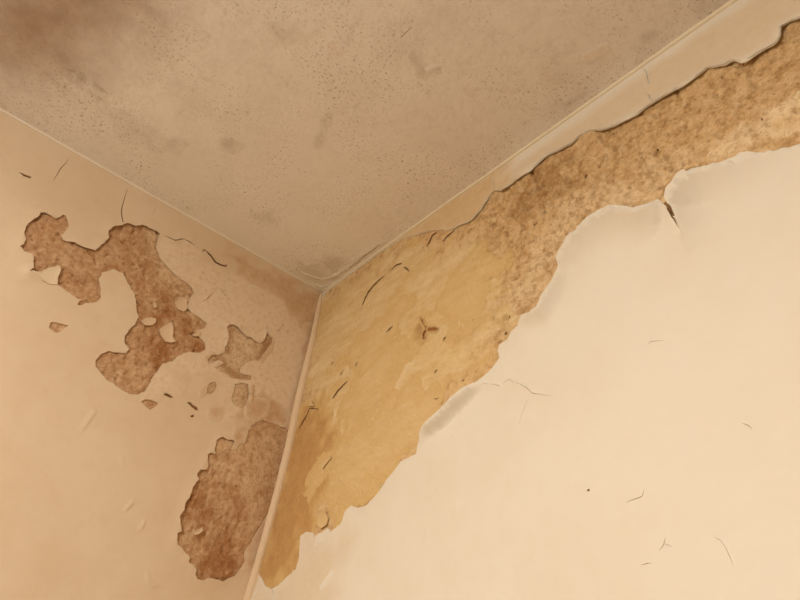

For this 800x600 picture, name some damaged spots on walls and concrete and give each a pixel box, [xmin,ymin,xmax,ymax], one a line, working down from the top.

flaking render [21,212,272,410]
leakage [246,0,800,600]
flaking render [517,292,539,314]
flaking render [322,18,800,300]
crack [664,202,677,224]
flaking render [177,420,288,582]